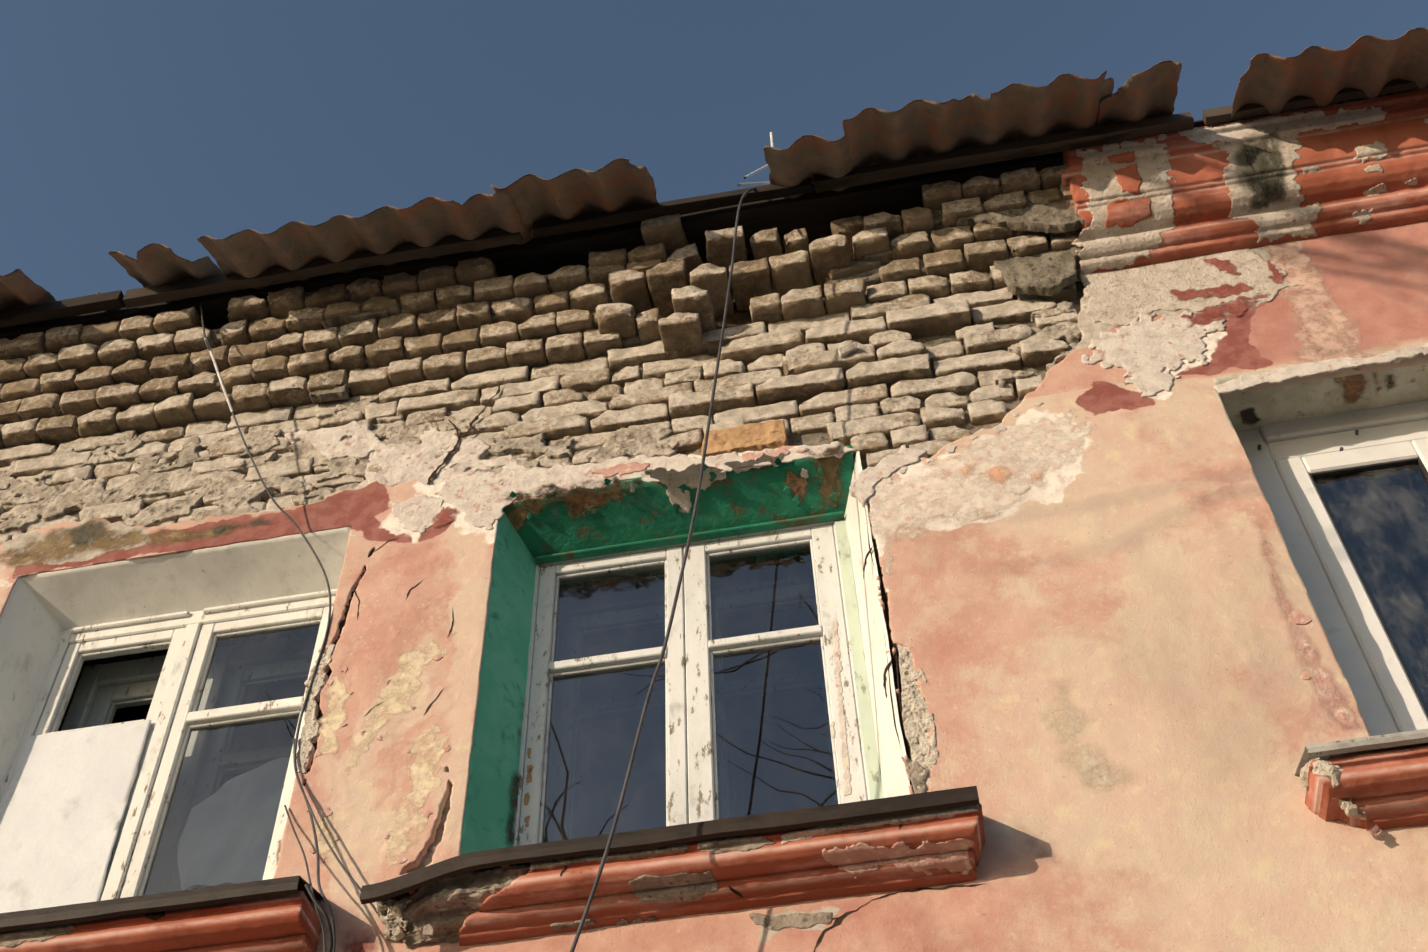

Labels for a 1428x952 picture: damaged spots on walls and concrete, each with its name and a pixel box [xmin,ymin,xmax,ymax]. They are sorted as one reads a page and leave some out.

water stain [1236,133,1284,210]
spalling [0,105,1388,545]
crack [296,538,397,786]
peeling [313,641,446,771]
crack [863,504,919,829]
spalling [897,638,939,794]
peeling [0,924,75,948]
peeling [305,807,340,864]
spalling [374,898,448,942]
peeling [385,725,451,866]
peeling [530,805,979,926]
crack [814,884,981,952]